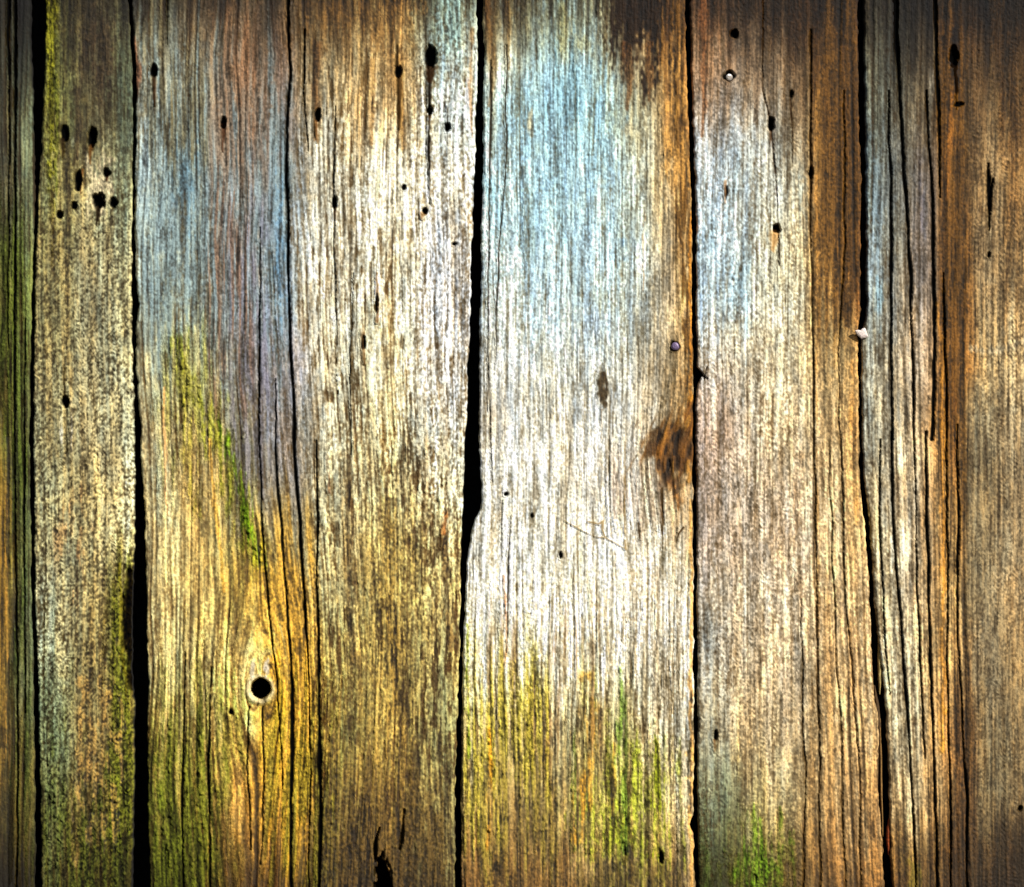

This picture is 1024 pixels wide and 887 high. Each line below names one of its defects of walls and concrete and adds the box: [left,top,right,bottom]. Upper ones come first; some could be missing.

leakage [150,297,258,547]
crack [245,0,336,887]
crack [332,225,354,456]
leakage [600,342,694,540]
crack [877,0,969,887]
crack [180,651,213,887]
leakage [148,450,696,887]